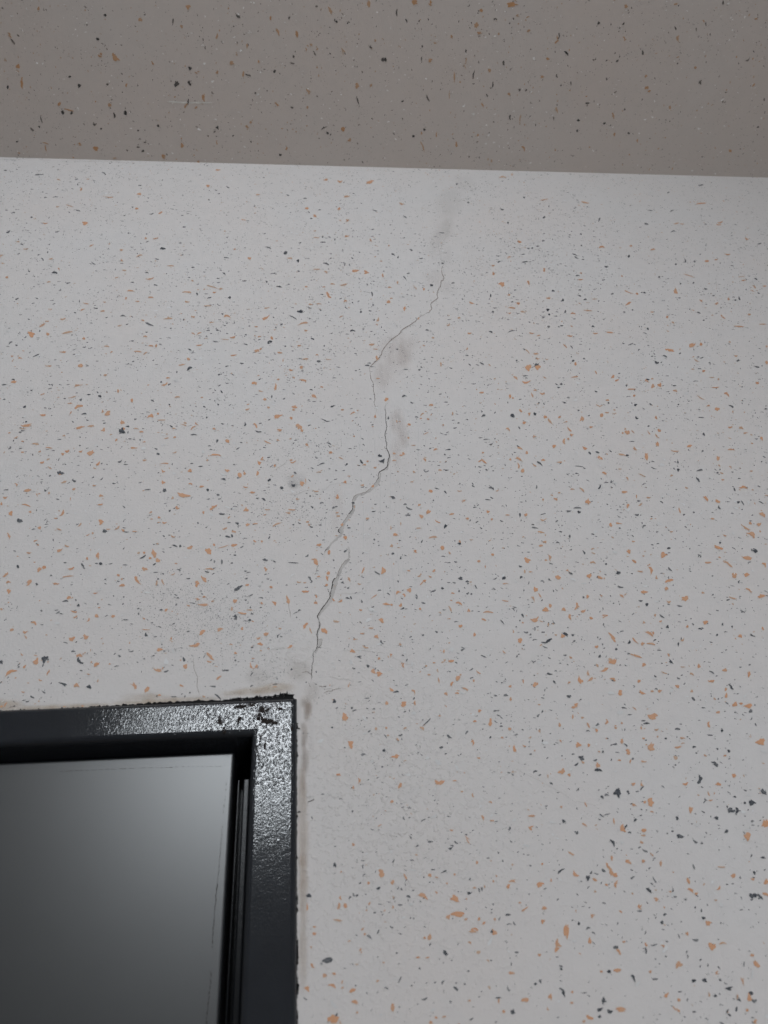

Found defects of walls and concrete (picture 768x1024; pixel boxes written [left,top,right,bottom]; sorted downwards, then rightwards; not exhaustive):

crack [293,230,448,692]